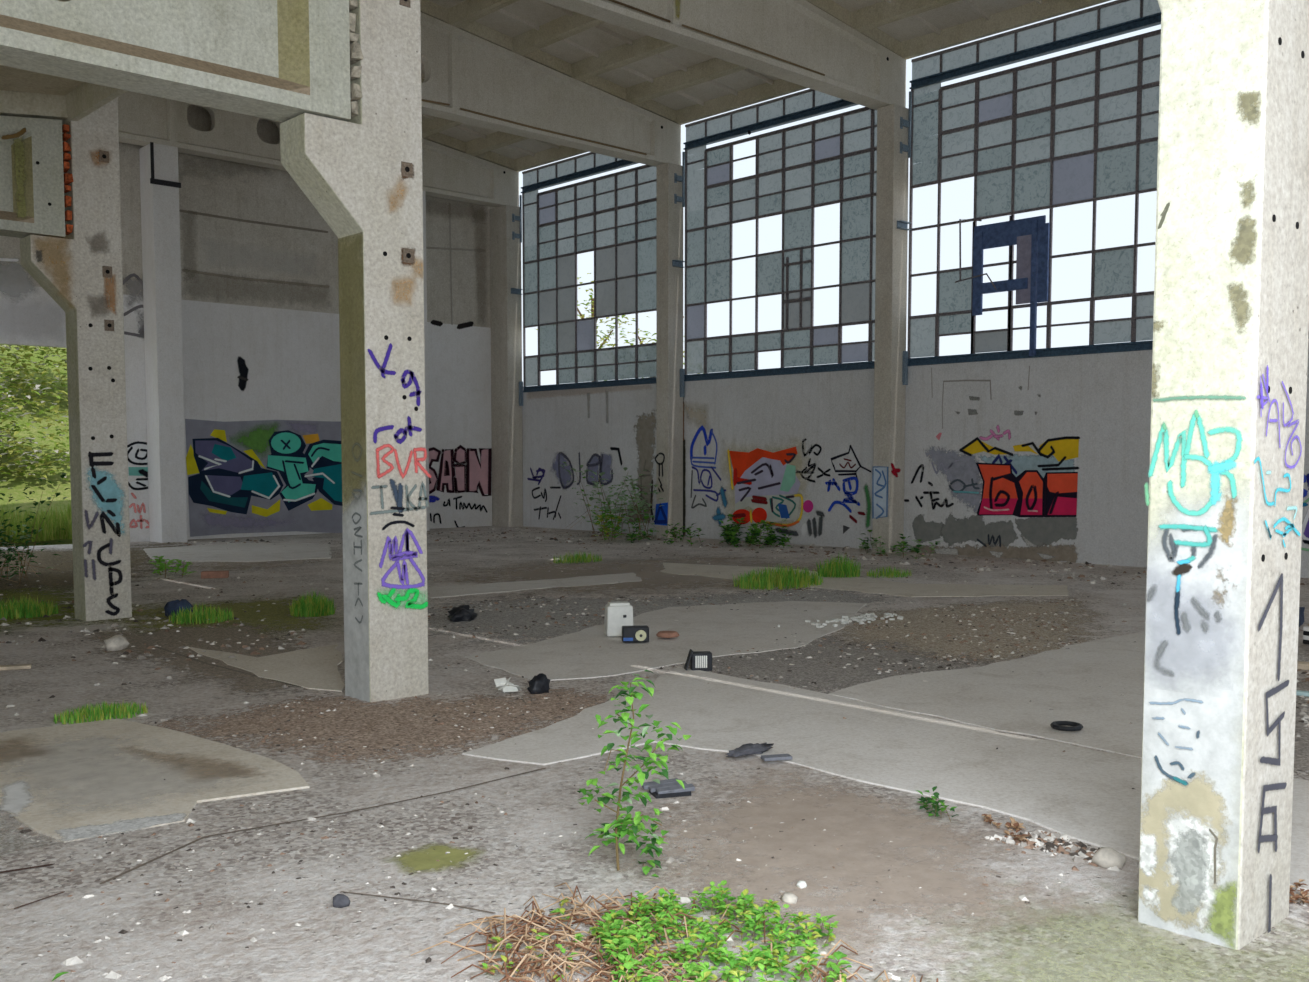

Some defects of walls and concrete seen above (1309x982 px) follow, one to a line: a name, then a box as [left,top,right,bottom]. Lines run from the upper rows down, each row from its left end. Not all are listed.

spalling [1139,775,1237,946]